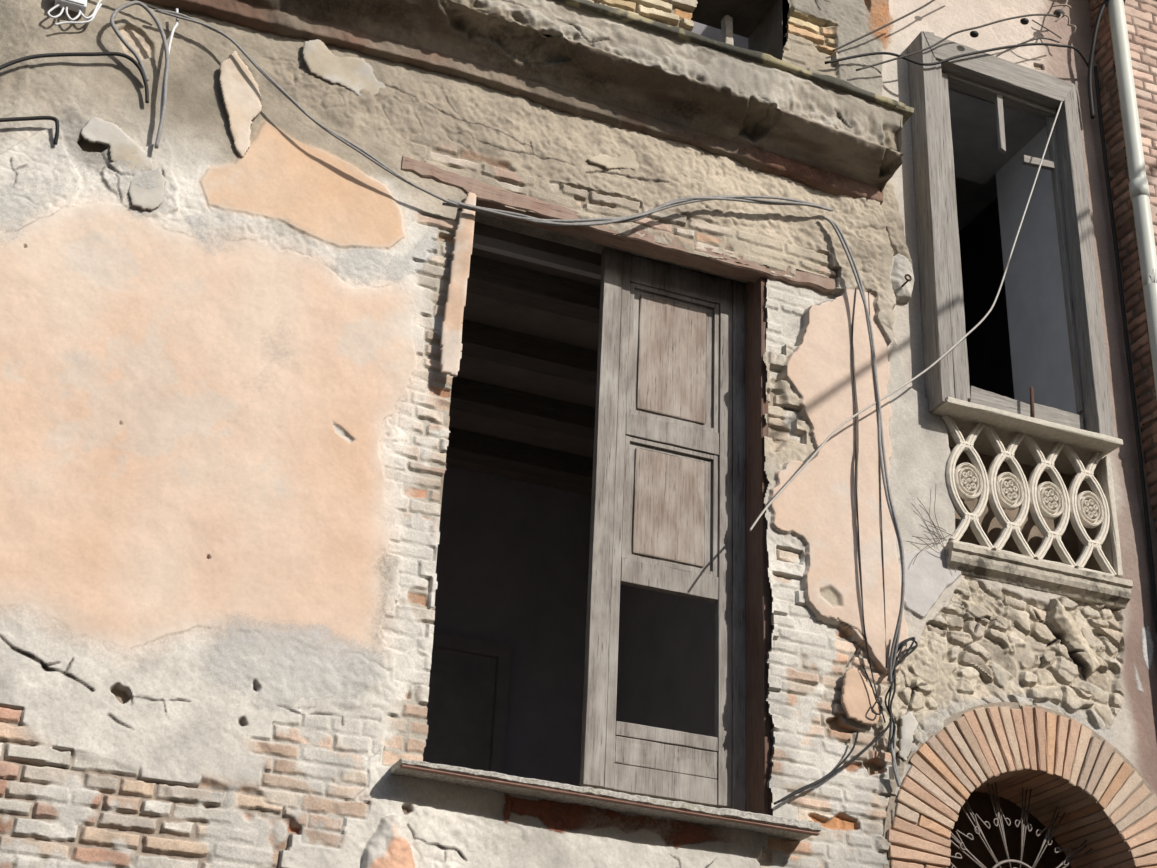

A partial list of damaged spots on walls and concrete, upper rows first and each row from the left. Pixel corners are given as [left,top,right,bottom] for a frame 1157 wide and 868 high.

flaking render [596,0,694,31]
peeling [200,51,405,249]
peeling [0,117,476,868]
peeling [410,139,1124,868]
crack [0,633,189,729]